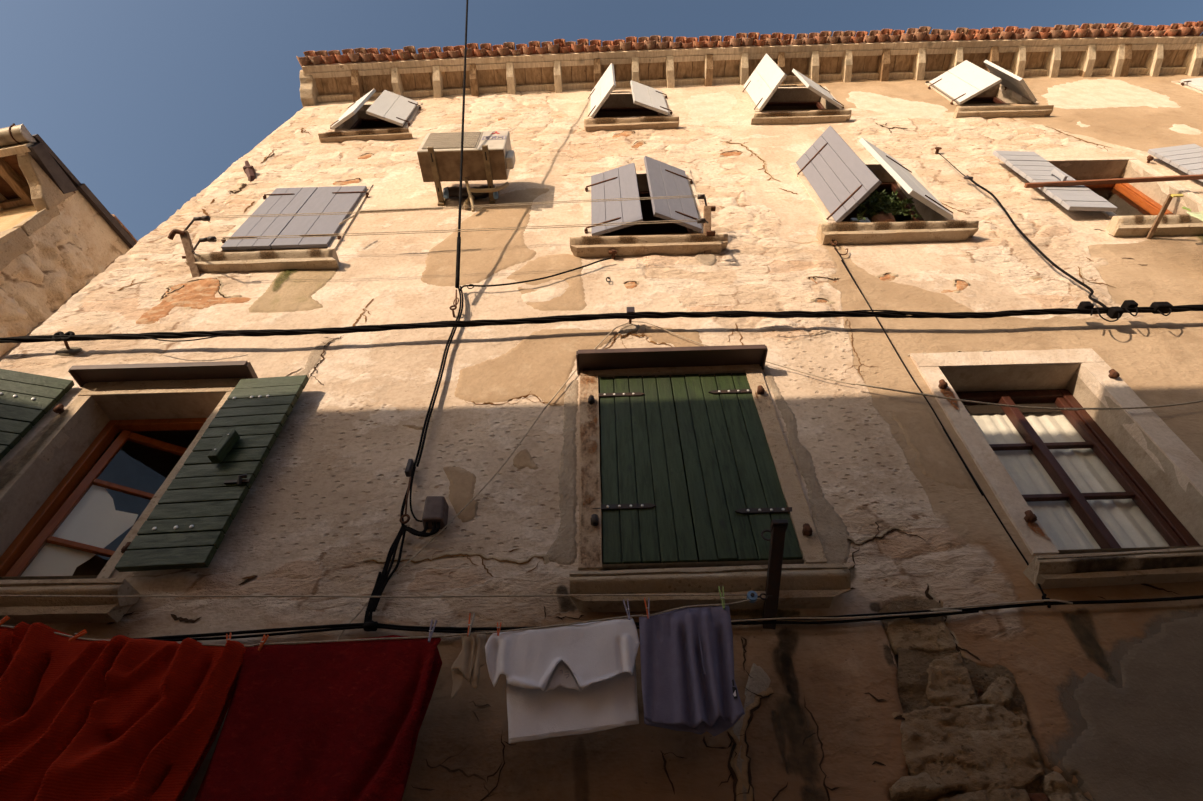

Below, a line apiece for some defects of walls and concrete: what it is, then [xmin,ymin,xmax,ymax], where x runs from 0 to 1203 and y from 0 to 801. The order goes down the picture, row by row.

flaking render [1041,78,1181,127]
flaking render [421,188,587,311]
spalling [136,277,251,324]
flaking render [454,328,618,406]
flaking render [637,324,704,347]
leakage [1064,609,1115,681]
crack [412,701,516,801]
crack [661,636,788,801]
leakage [772,628,826,801]
crack [804,699,840,801]